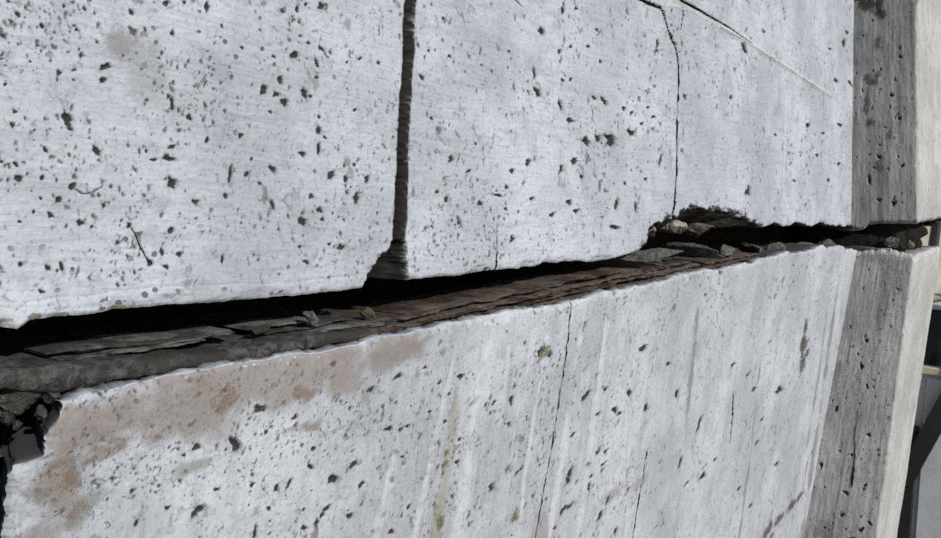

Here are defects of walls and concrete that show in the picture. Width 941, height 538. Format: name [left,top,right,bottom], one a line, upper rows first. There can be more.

crack [382,136,410,259]
crack [638,0,751,213]
spalling [672,210,748,227]
crack [535,302,571,538]